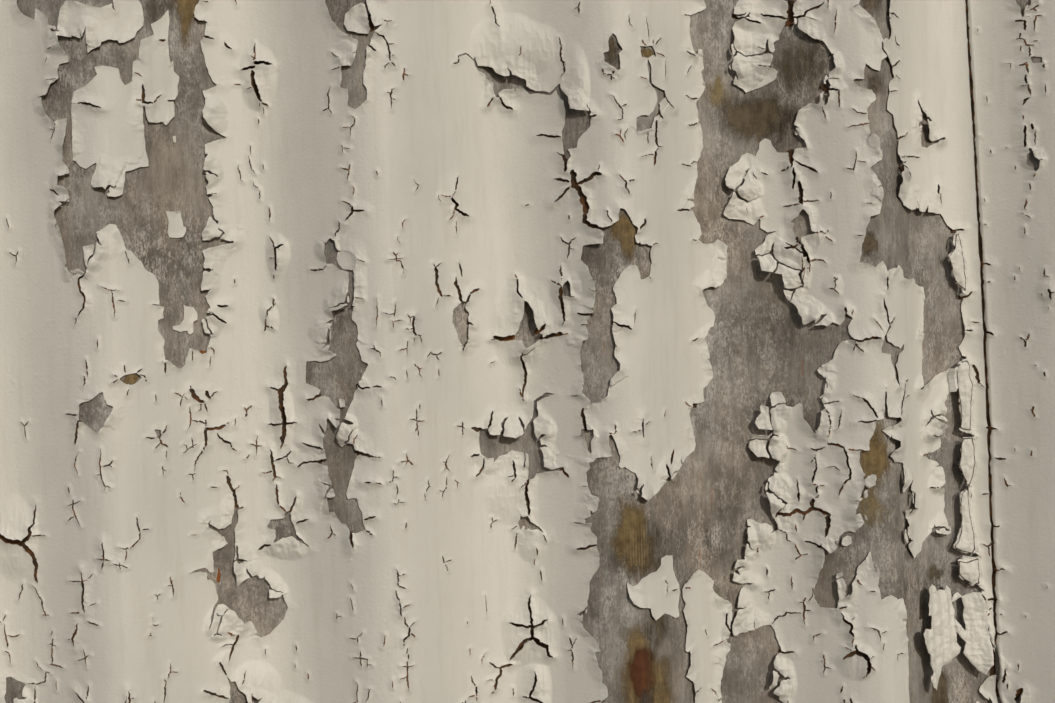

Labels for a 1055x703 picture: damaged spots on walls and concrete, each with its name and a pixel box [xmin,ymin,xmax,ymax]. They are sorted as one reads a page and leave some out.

crack [0,506,149,703]
peeling [11,0,242,374]
crack [155,366,335,539]
peeling [184,493,317,643]
peeling [298,222,376,550]
peeling [320,0,390,113]
crack [462,548,577,703]
crack [490,95,657,401]
rust [621,626,656,703]
peeling [453,0,1031,703]
crack [757,395,905,703]
crack [965,0,1054,703]